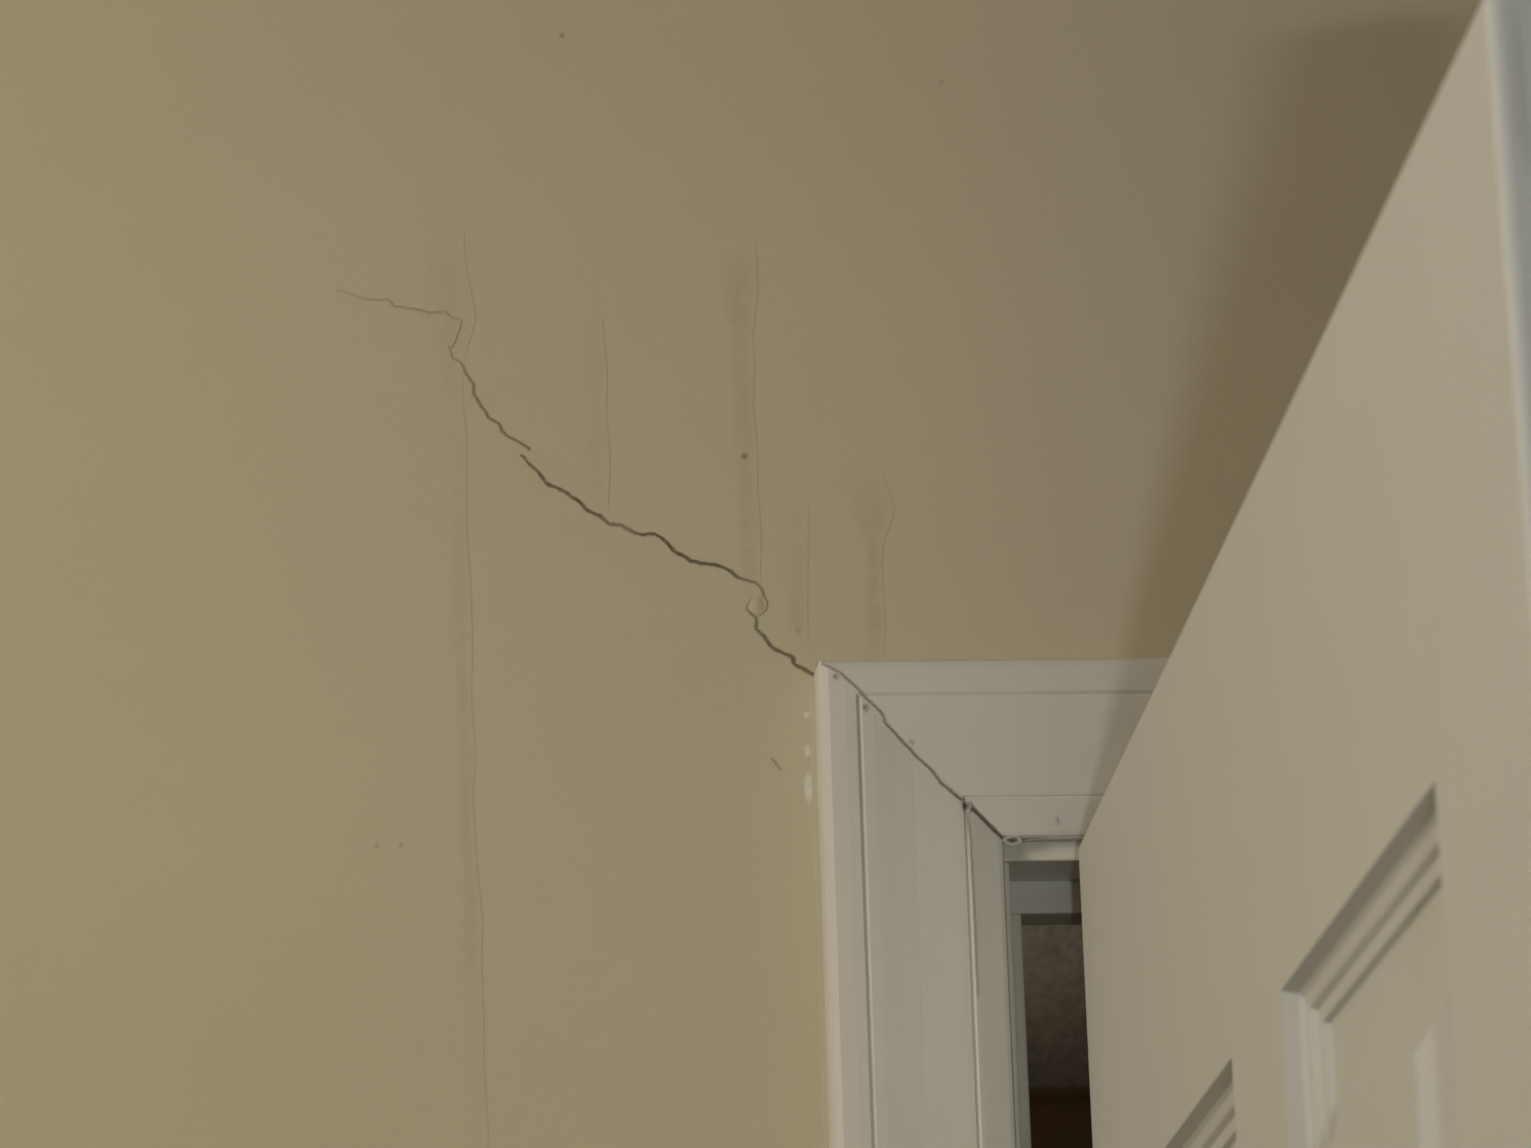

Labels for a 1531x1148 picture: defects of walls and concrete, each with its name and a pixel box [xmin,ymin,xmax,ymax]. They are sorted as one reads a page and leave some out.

crack [336,289,1084,996]